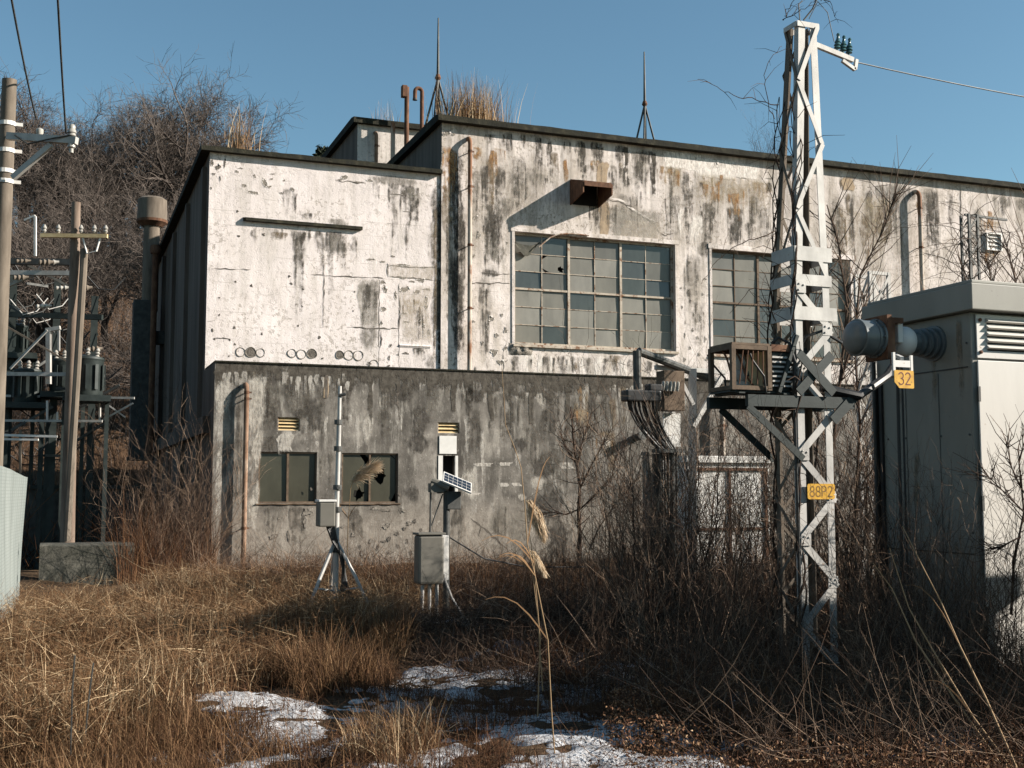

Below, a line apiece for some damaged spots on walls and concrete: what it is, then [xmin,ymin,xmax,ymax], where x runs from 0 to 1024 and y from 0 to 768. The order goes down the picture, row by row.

corrosion [474,148,501,206]
damp [474,134,769,327]
damp [214,160,658,560]